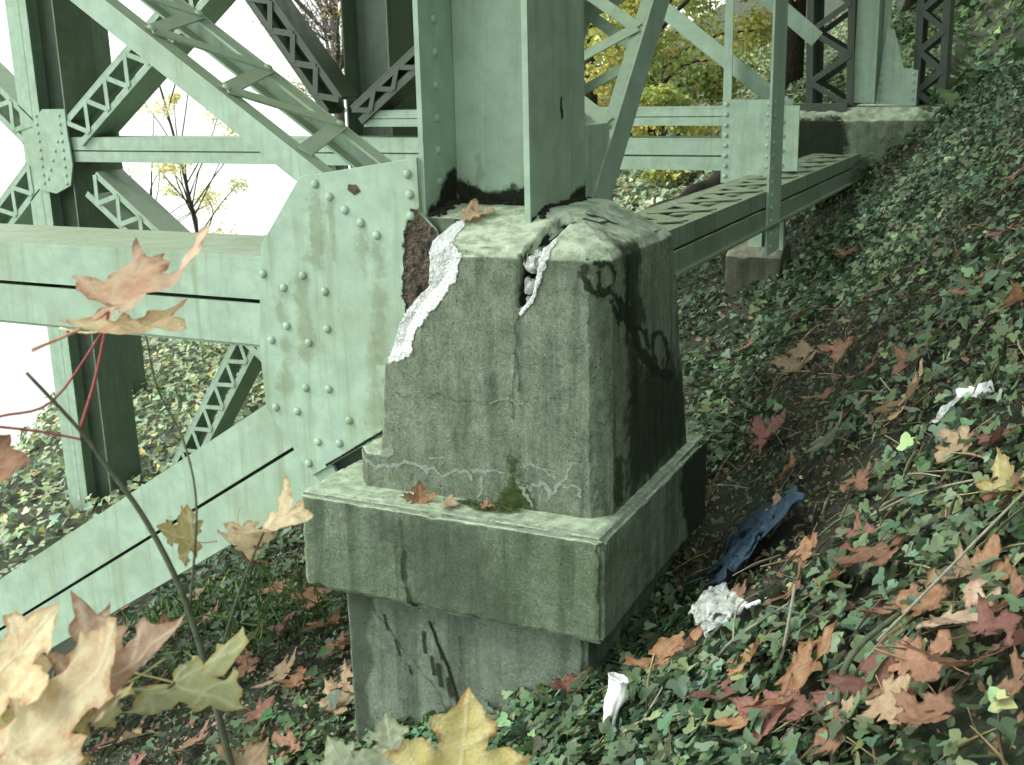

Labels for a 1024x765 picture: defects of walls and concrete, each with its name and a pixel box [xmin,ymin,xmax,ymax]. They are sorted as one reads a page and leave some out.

corrosion [401,208,437,313]
spalling [388,220,466,363]